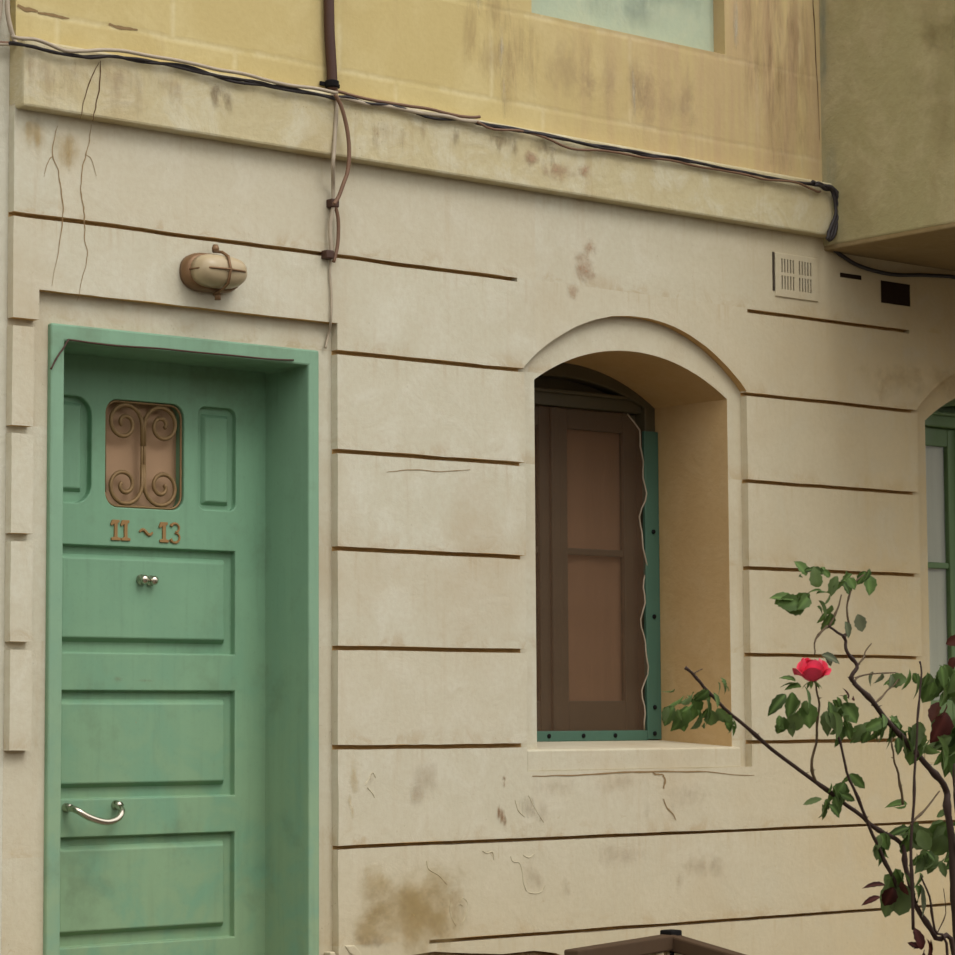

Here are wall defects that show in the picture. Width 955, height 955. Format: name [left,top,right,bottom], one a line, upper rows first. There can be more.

crack [17,4,69,19]
crack [812,3,820,141]
crack [44,61,101,300]
crack [532,771,752,820]